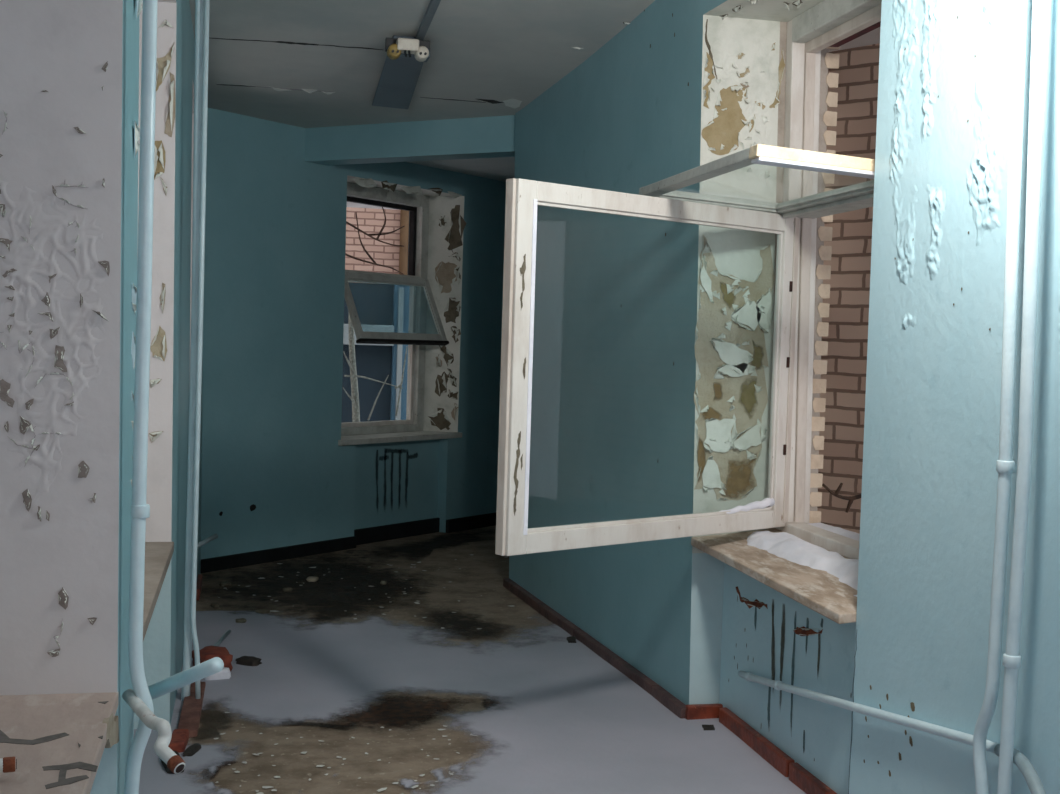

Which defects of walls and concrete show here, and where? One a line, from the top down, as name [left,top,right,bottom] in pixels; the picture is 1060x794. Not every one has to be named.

peeling [154,42,175,195]
peeling [701,42,785,155]
peeling [150,326,167,361]
peeling [352,177,467,430]
peeling [694,235,775,501]
corrosion [376,449,418,509]
peeling [513,431,523,515]
damp [204,532,491,624]
damp [426,611,511,640]
damp [266,695,469,729]
damp [482,698,500,709]
corrosion [767,601,823,761]